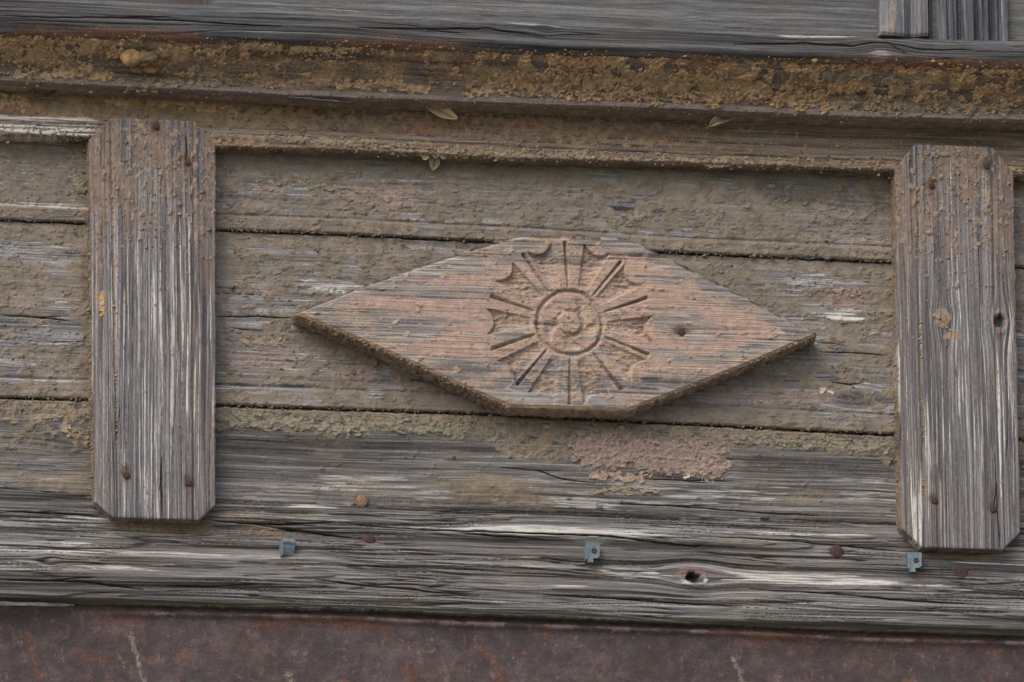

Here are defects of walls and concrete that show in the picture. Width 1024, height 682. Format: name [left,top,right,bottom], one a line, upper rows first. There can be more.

peeling [0,36,348,113]
peeling [334,76,431,94]
peeling [462,63,829,108]
peeling [568,426,890,499]